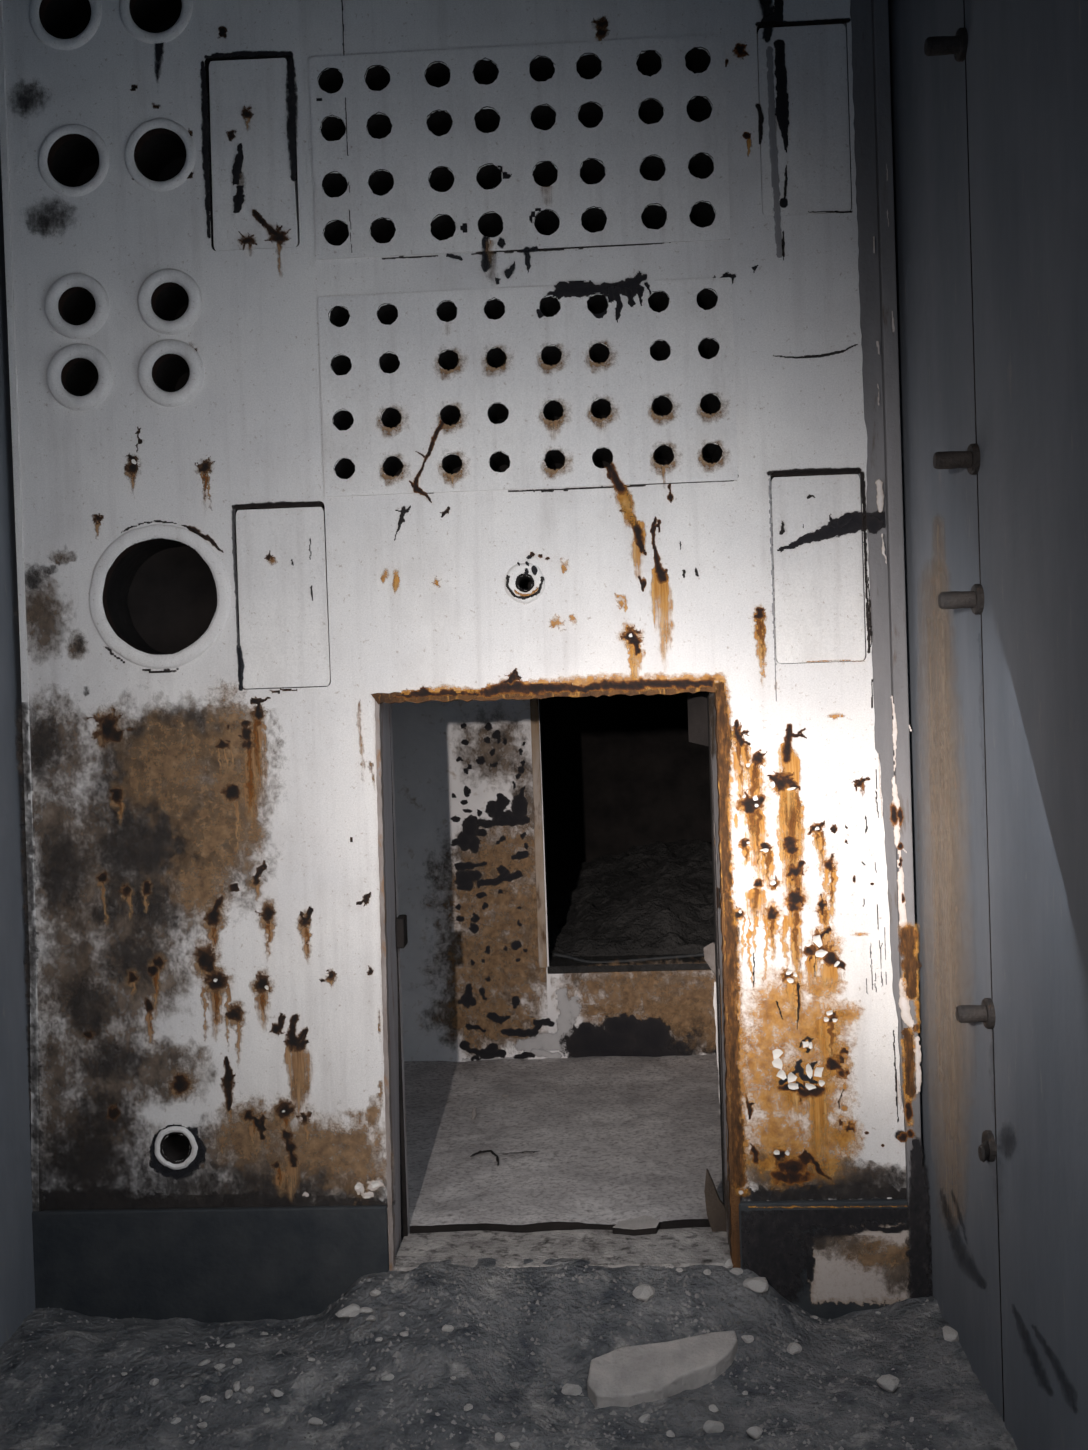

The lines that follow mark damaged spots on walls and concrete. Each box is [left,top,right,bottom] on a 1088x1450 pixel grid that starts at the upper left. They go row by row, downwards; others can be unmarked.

water stain [759,0,775,43]
corrosion [195,456,215,500]
crack [381,420,444,592]
water stain [69,635,86,658]
corrosion [358,702,375,783]
corrosion [64,501,323,1198]
peeling [450,723,722,1061]
corrosion [393,593,908,1208]
corrosion [319,970,337,985]
corrosion [365,1080,383,1127]